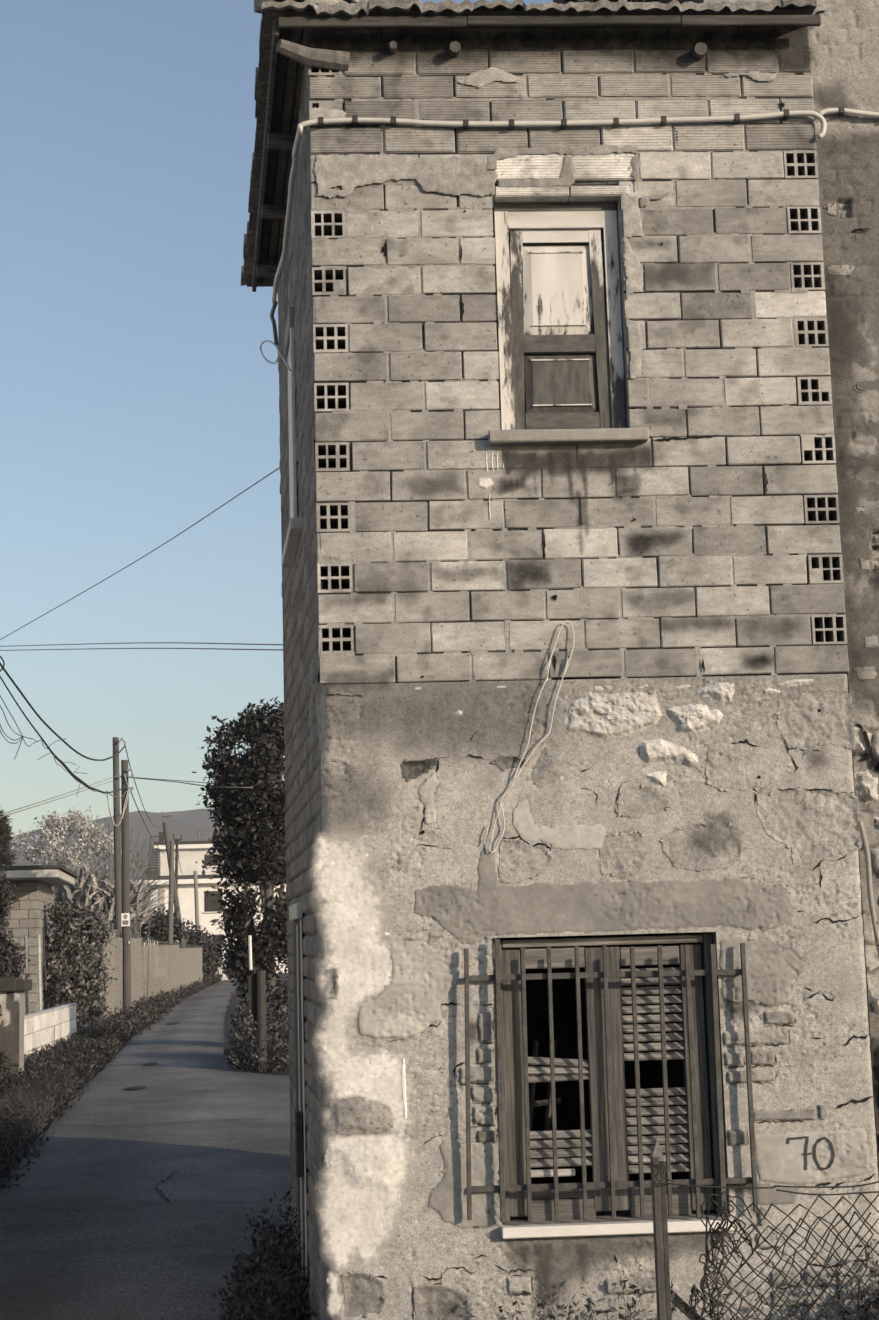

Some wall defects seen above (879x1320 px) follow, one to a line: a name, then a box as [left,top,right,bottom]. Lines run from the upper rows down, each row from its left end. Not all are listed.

leakage [486,447,652,525]
flaking render [853,665,877,681]
flaking render [865,634,879,648]
flaking render [401,757,437,781]
flaking render [564,679,879,883]
peeling [314,835,425,1318]